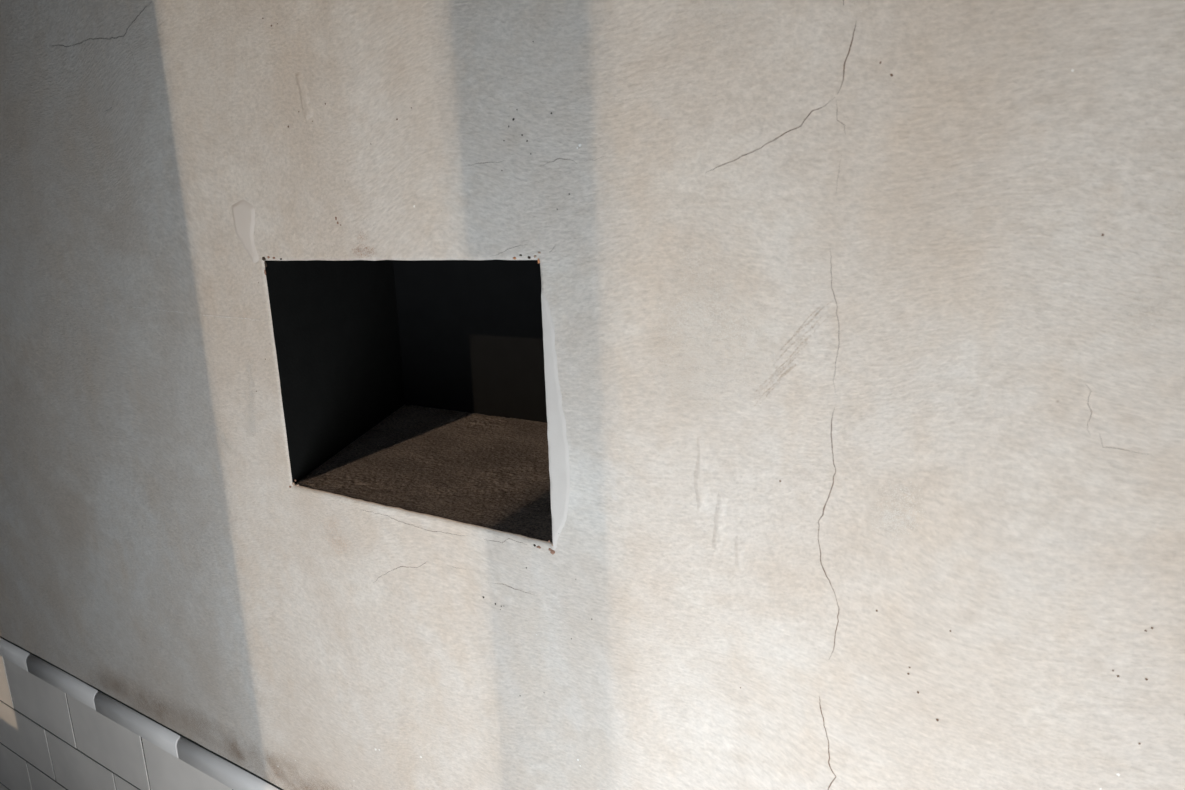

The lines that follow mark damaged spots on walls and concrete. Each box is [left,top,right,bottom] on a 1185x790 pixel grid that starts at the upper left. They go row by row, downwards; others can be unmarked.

crack [820,706,836,790]